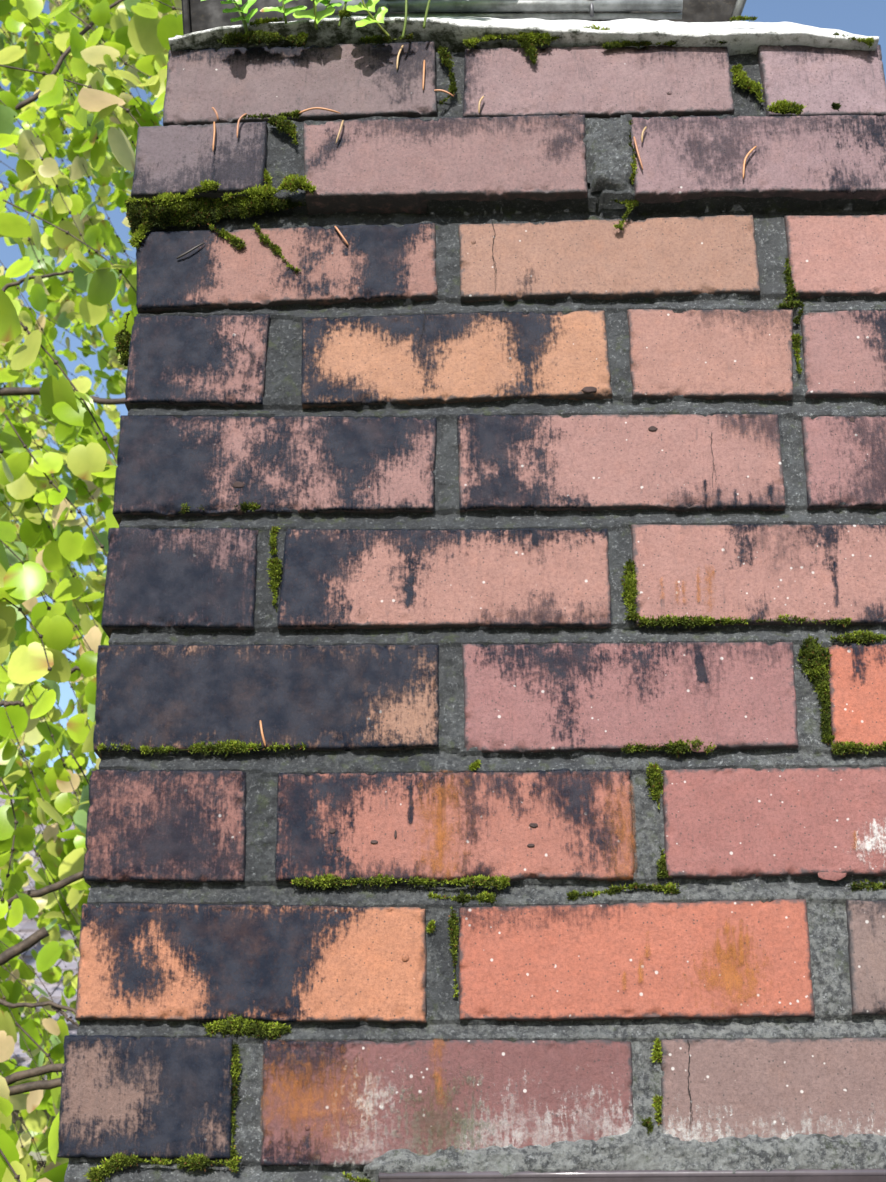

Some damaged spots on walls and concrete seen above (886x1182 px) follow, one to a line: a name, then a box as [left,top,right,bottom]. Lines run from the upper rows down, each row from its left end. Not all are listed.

water stain [704,480,753,510]
water stain [405,554,414,607]
water stain [694,644,709,683]